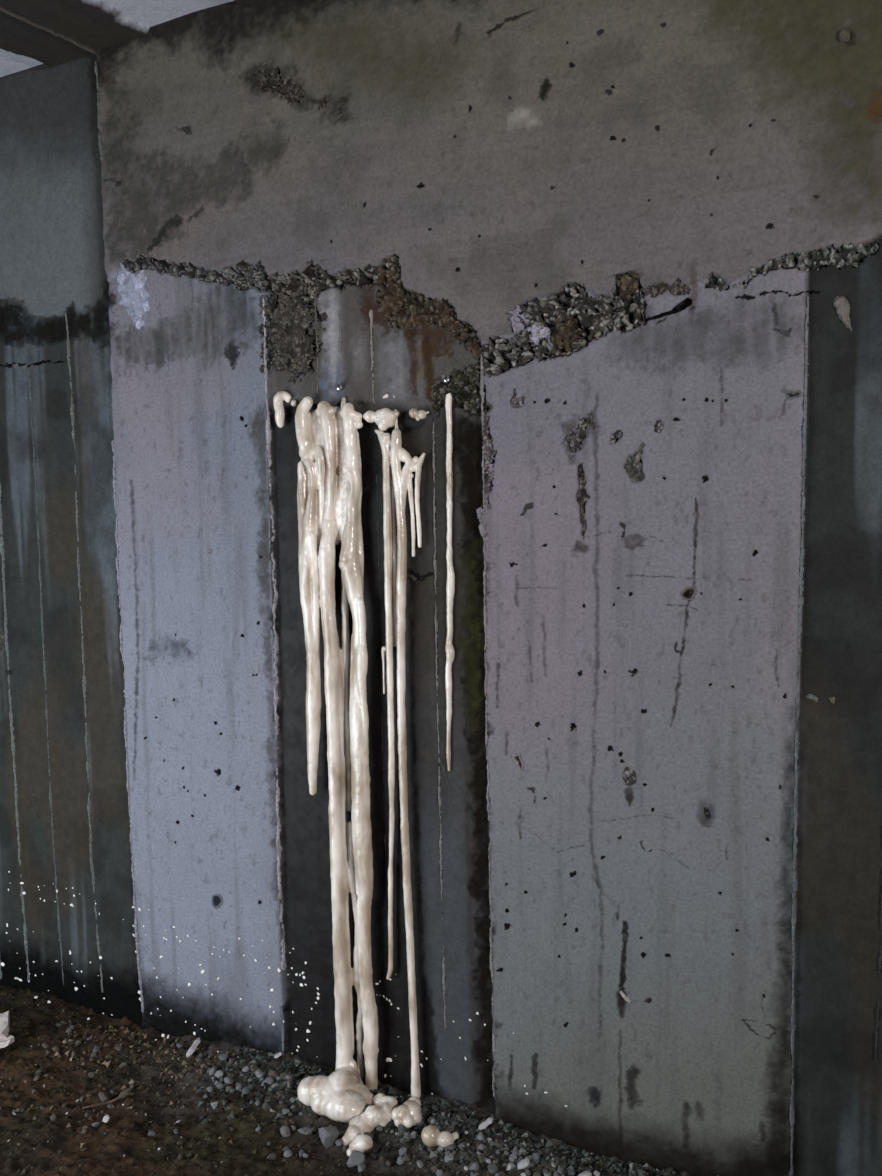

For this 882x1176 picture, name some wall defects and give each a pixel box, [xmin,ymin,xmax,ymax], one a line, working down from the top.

crack [487,11,531,37]
damp [146,216,193,254]
damp [0,263,168,375]
peeling [509,305,552,346]
peeling [833,296,852,331]
spalling [782,389,801,400]
spalling [624,442,644,482]
spalling [575,463,591,551]